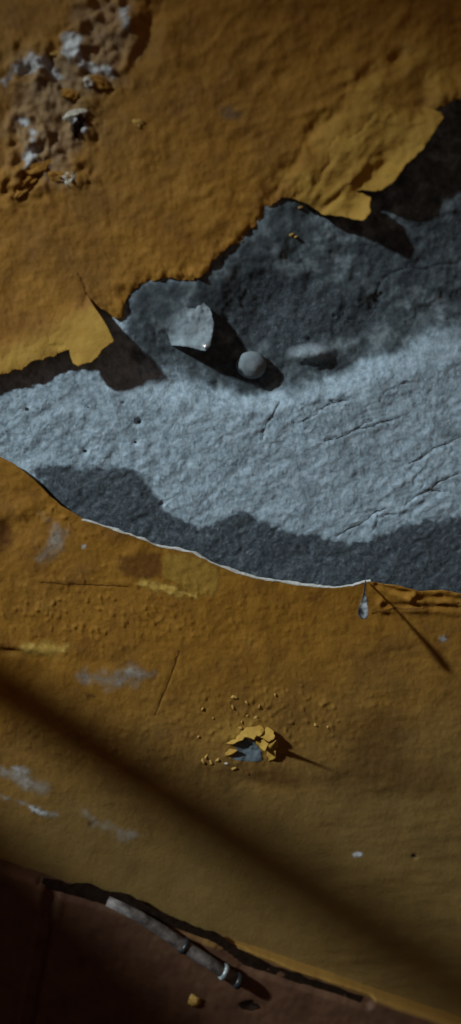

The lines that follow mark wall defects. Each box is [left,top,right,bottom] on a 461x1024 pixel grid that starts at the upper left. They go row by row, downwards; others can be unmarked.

peeling [1,32,113,139]
peeling [14,118,77,199]
peeling [289,93,461,221]
peeling [0,295,461,546]
peeling [82,518,371,619]
spalling [201,695,278,776]